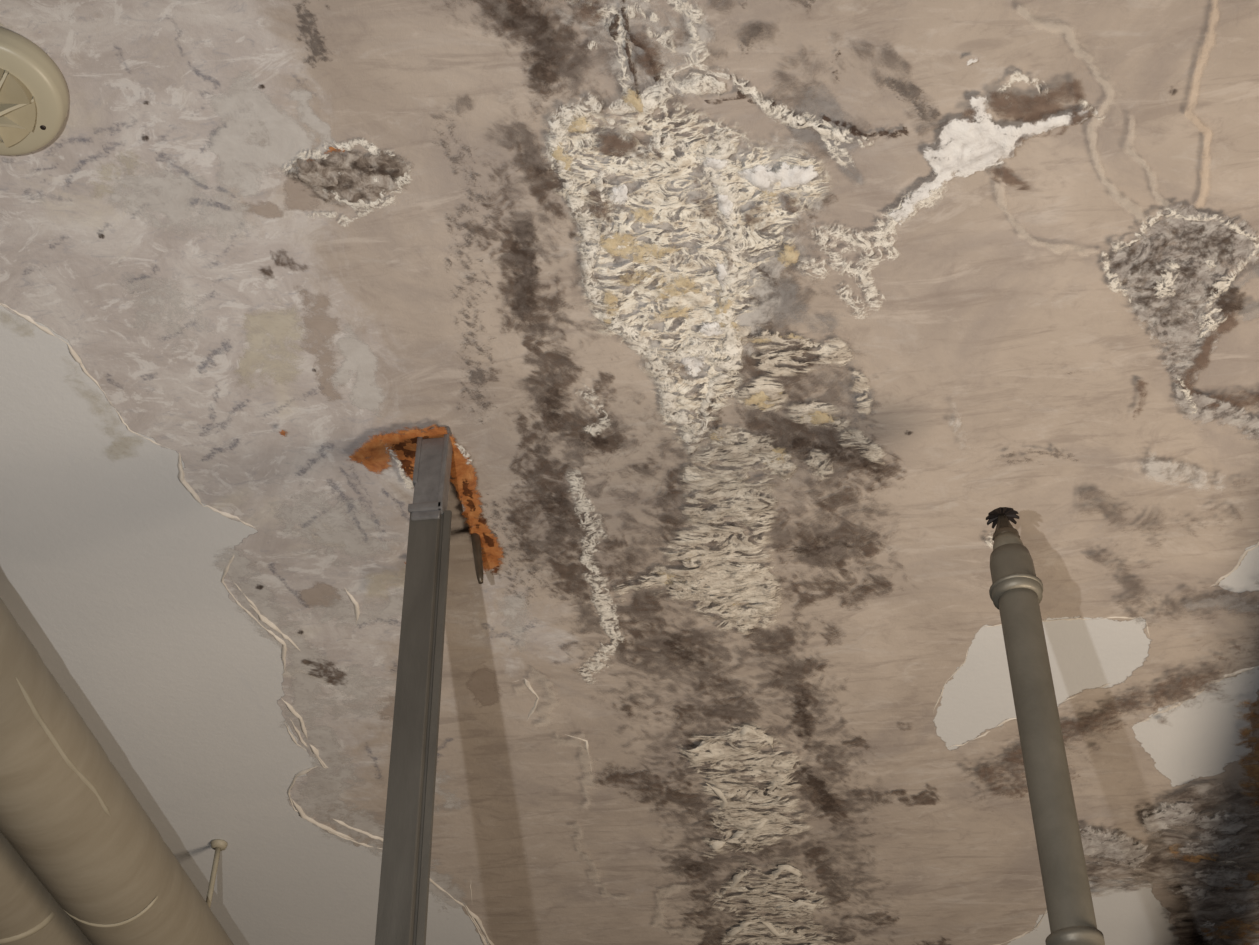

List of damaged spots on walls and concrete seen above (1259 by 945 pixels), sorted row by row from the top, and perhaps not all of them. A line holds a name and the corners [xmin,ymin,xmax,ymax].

crack [609,0,660,99]
peeling [716,170,748,194]
peeling [1134,276,1153,293]
peeling [1184,295,1210,305]
peeling [696,319,727,350]
peeling [1191,252,1259,423]
rust [349,425,504,575]
water stain [447,0,946,945]
water stain [1144,458,1224,490]
peeling [710,577,760,611]
water stain [1087,554,1259,620]
rust [1236,701,1259,805]